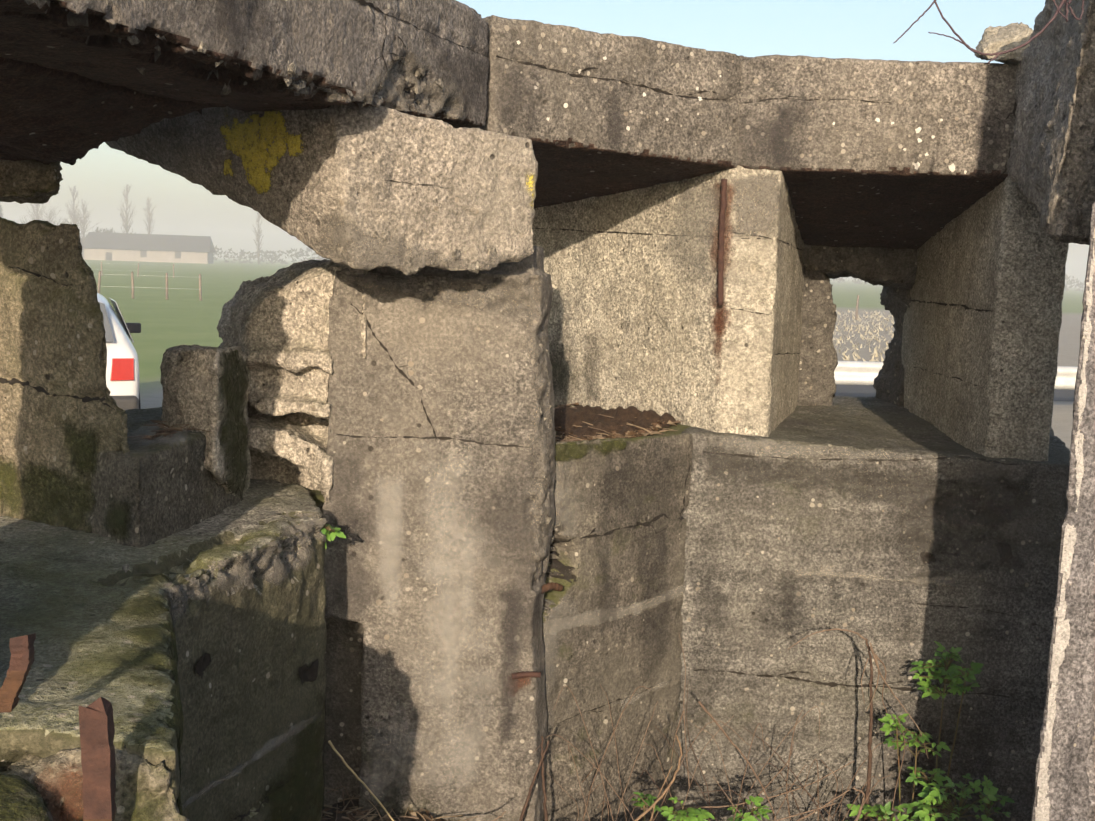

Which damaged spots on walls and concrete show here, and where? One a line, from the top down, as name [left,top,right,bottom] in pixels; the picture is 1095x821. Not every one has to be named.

corrosion [713,296,728,353]
crack [329,303,531,448]
crack [818,455,1024,465]
crack [557,443,791,541]
crack [694,669,1009,698]